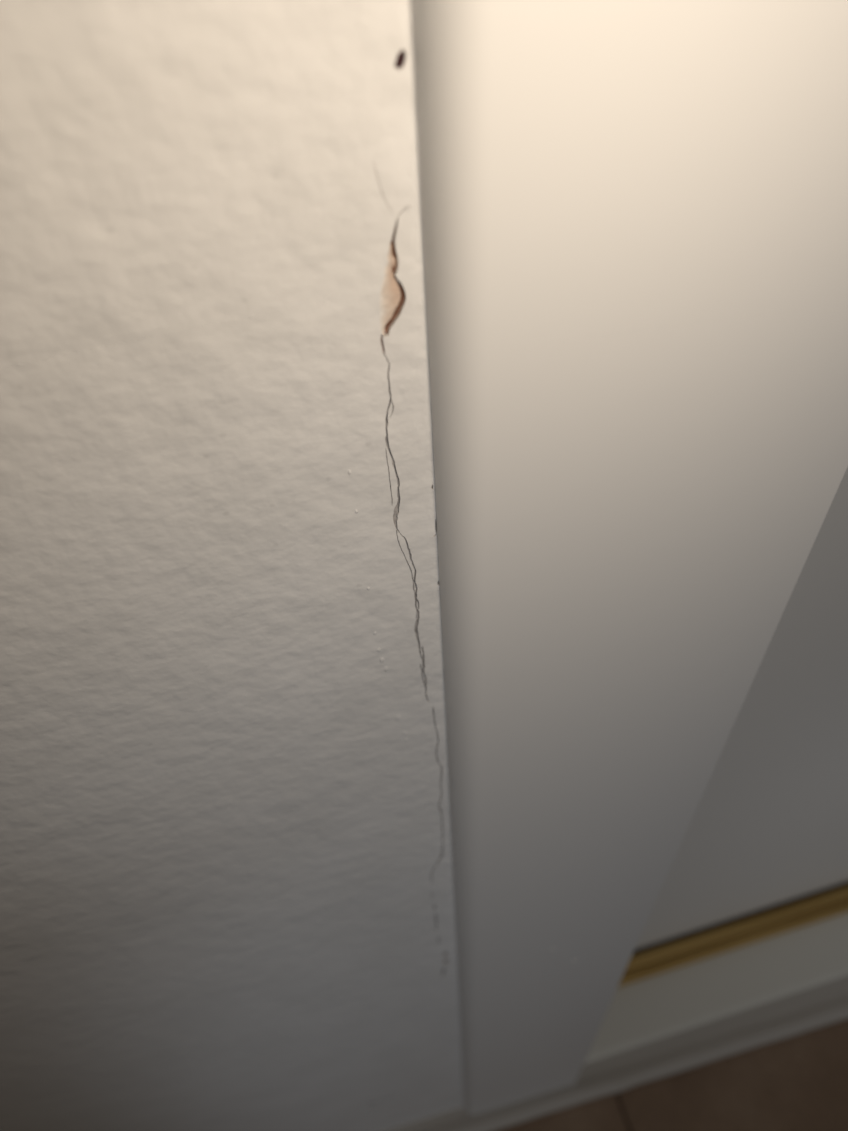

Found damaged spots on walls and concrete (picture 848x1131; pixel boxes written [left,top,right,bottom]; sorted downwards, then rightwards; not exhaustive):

spalling [373,162,405,354]
crack [383,352,443,943]